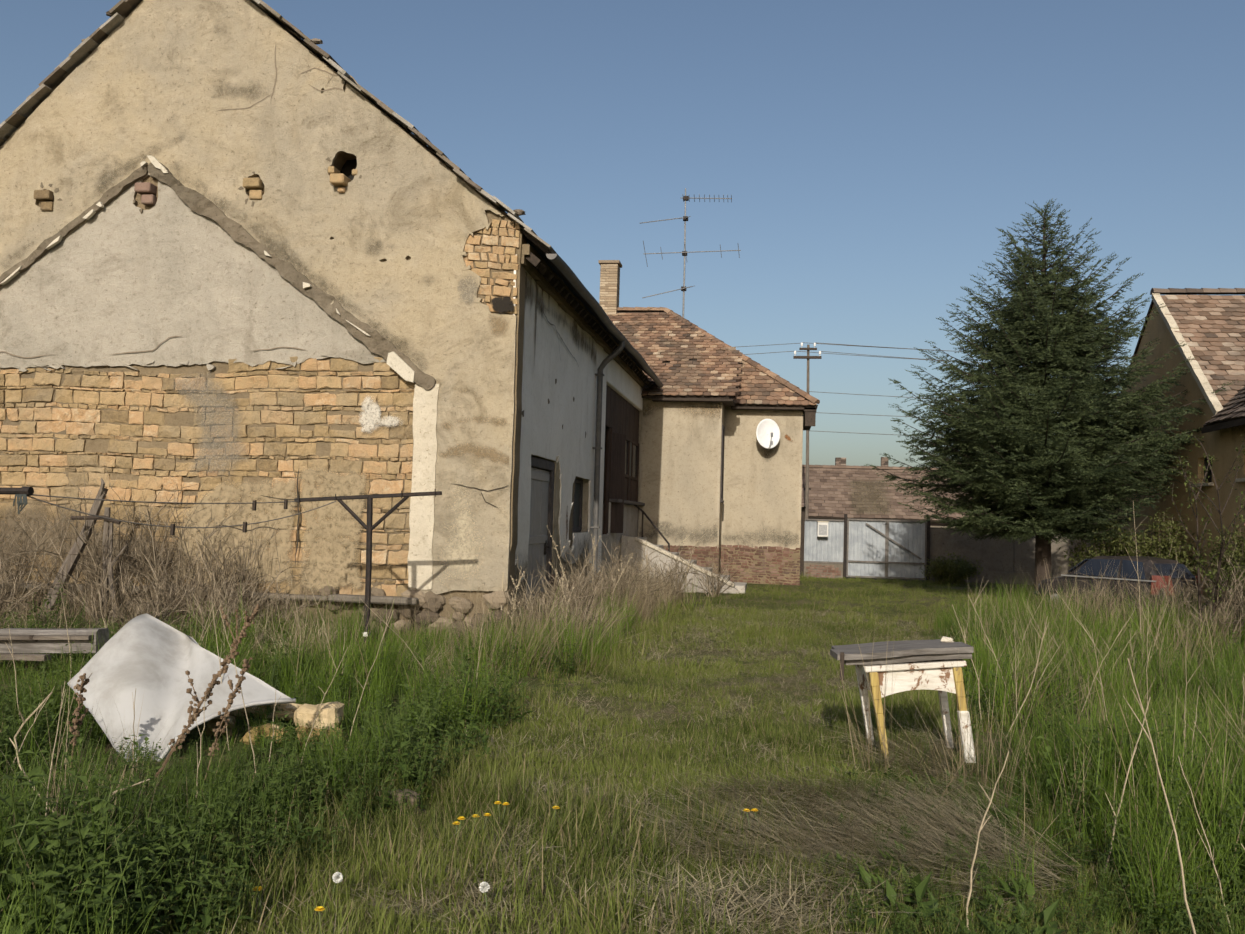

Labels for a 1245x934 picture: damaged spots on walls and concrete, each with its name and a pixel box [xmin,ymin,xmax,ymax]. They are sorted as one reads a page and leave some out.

crack [218,46,358,111]
spalling [326,157,362,193]
flaking render [460,219,521,333]
flaking render [0,352,416,597]
crack [455,484,509,508]